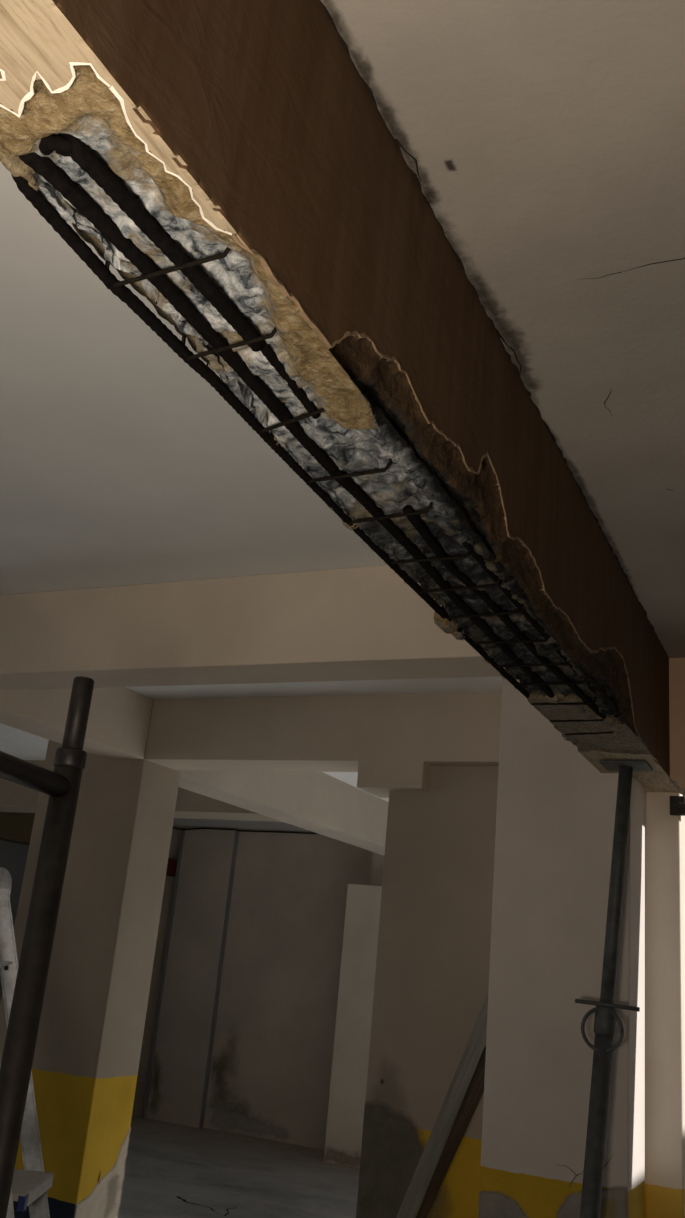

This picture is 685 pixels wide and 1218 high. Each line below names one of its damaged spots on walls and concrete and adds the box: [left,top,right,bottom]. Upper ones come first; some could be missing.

crack [579,258,685,280]
crack [321,2,668,656]
spalling [0,62,650,755]
damp [325,1104,424,1218]
peeling [478,1191,528,1218]